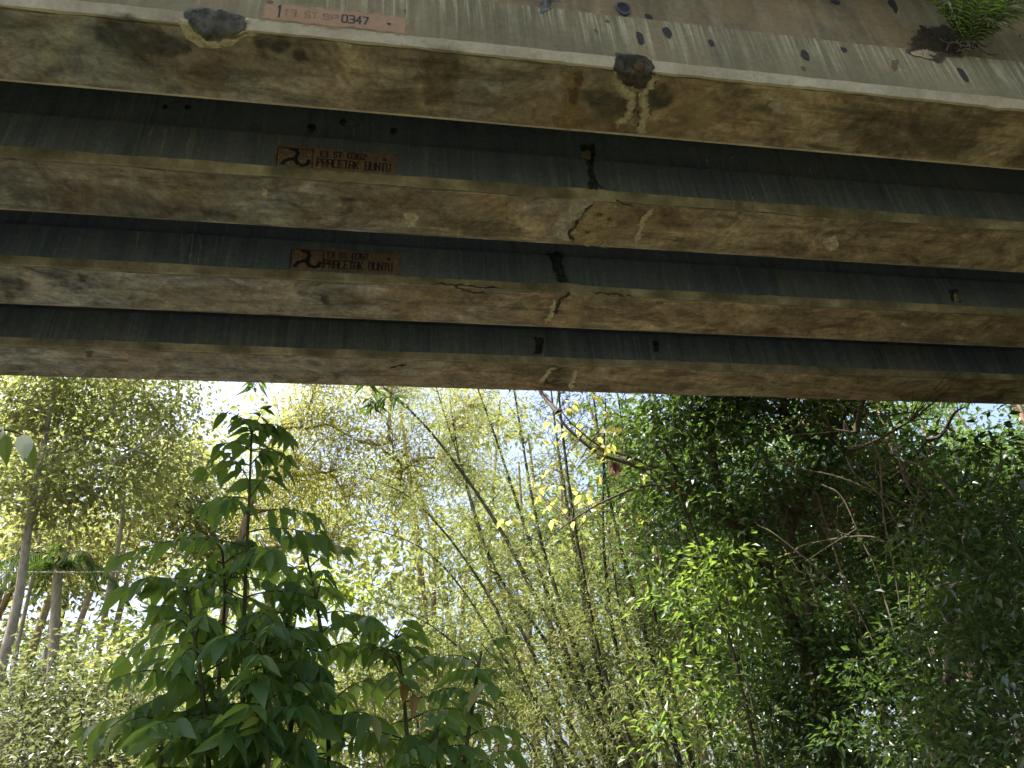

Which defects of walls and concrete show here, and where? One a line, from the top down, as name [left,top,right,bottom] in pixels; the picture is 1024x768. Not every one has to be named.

spalling [178,7,256,49]
crack [568,199,633,241]
crack [437,282,498,294]
crack [554,292,631,315]